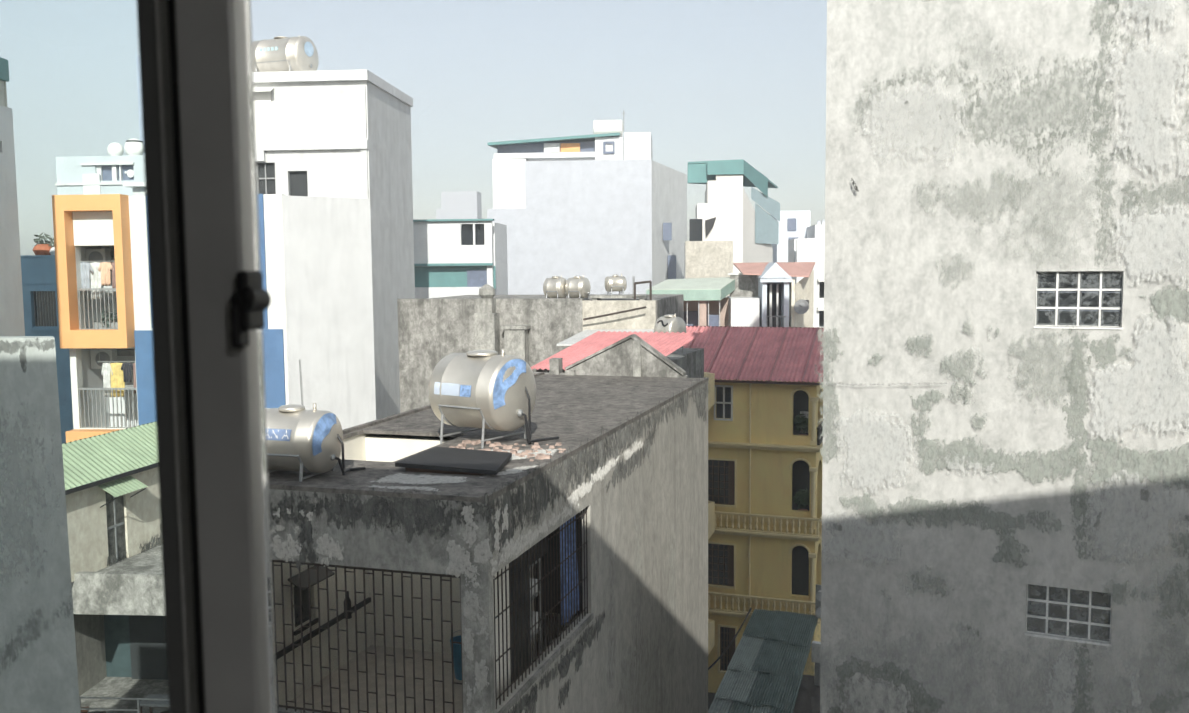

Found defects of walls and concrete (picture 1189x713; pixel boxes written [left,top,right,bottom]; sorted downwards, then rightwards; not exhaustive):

water stain [0,338,54,372]
peeling [365,473,467,491]
water stain [269,378,708,568]
peeling [270,508,344,566]
peeling [446,439,644,713]